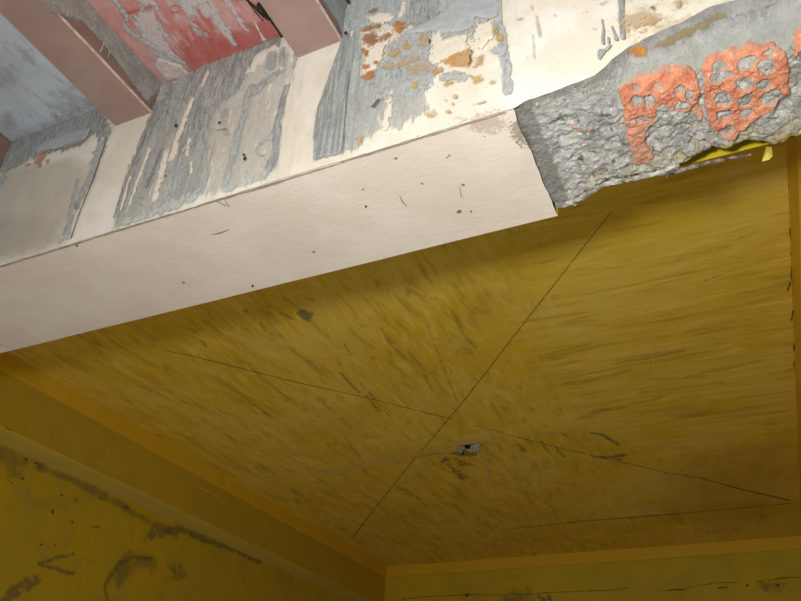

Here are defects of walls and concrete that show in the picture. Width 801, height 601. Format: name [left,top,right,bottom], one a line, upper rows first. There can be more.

flaking render [0,109,111,173]
peeling [111,0,191,82]
peeling [175,0,267,47]
peeling [344,12,494,146]
rust [360,21,495,88]
spalling [514,0,801,208]
crack [165,214,610,538]
crack [478,426,791,530]